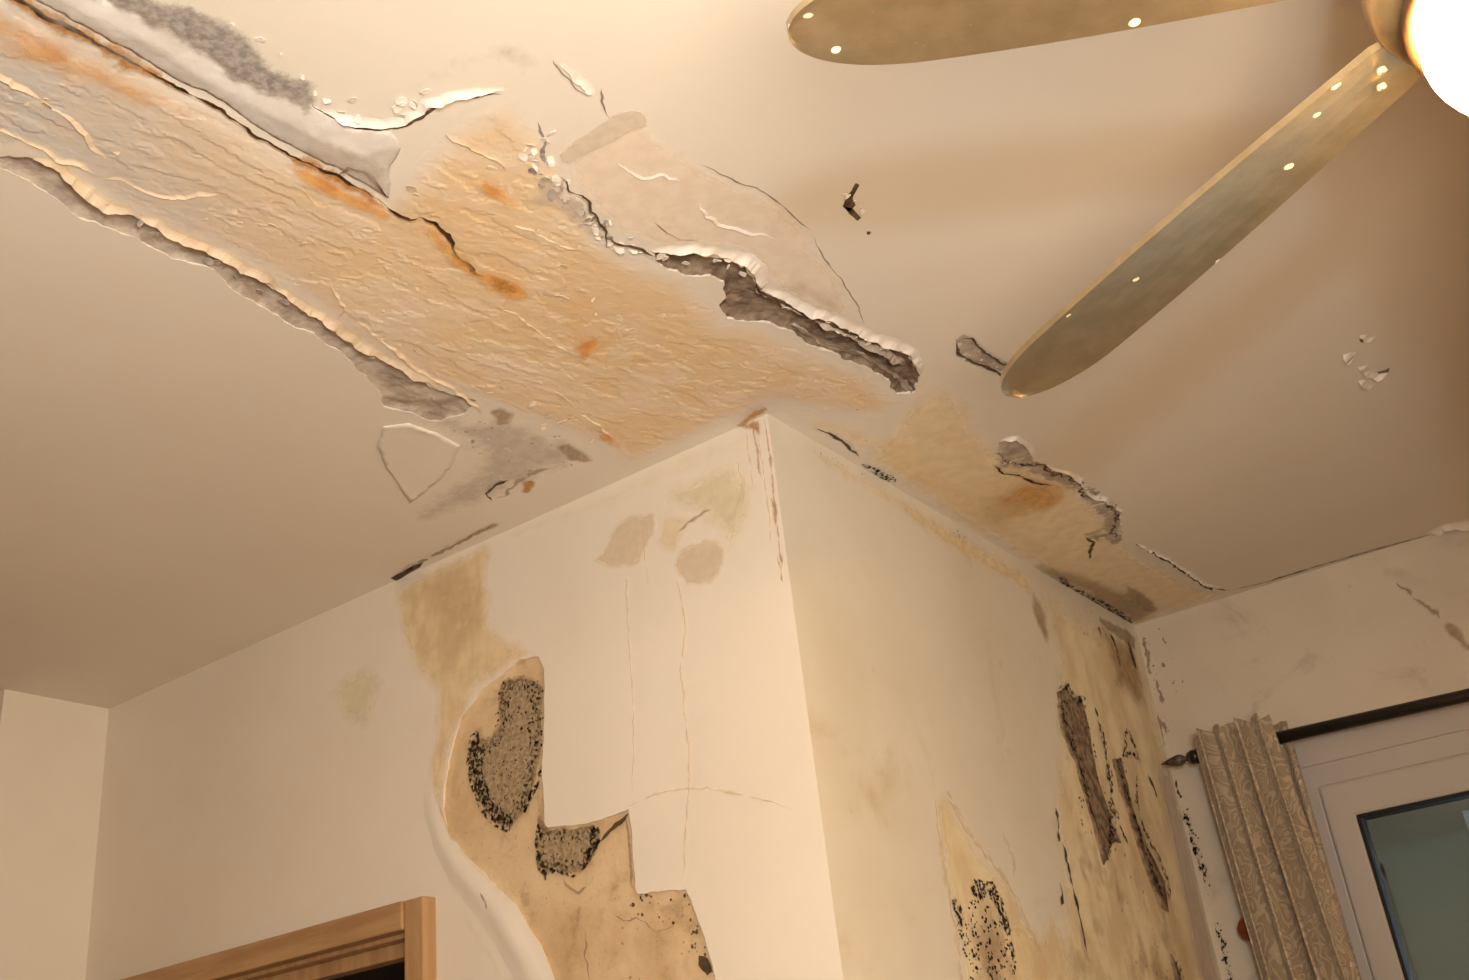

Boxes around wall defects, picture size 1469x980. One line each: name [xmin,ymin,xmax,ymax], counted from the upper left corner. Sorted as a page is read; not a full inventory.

peeling [0,0,927,503]
leakage [616,160,683,181]
leakage [699,167,863,321]
spalling [956,335,1007,376]
leakage [454,410,592,501]
leakage [678,542,721,582]
peeling [994,435,1126,559]
leakage [391,517,713,975]
spalling [444,657,716,980]
leakage [944,574,1232,980]